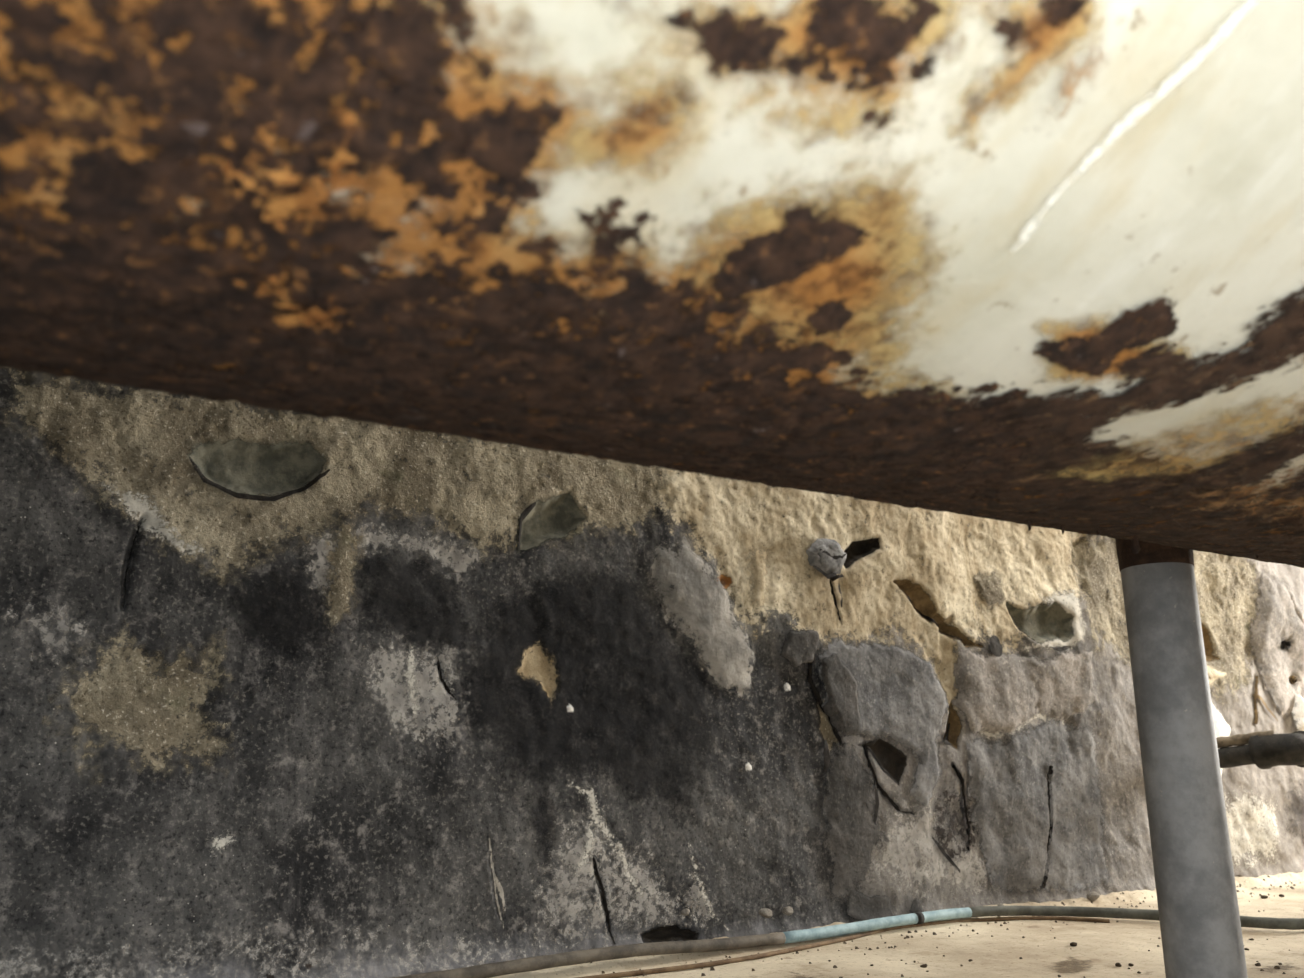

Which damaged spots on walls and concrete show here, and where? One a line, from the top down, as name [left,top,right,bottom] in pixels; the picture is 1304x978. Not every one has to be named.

rust [0,0,1304,568]
damp [101,483,210,554]
crack [122,523,141,606]
rust [717,574,732,589]
damp [9,604,87,660]
spalling [2,367,1132,921]
spalling [1193,550,1304,715]
damp [243,522,729,947]
damp [212,836,234,851]
crack [1042,766,1053,888]
damp [0,946,47,978]
damp [67,926,526,978]